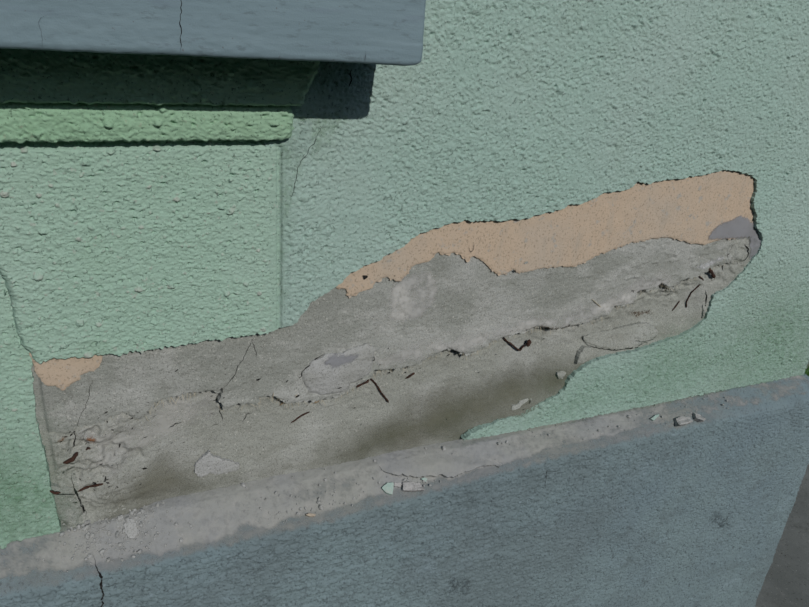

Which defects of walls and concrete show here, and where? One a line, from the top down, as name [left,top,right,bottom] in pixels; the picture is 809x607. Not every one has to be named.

spalling [29,170,754,528]
crack [56,475,86,519]
crack [95,561,104,607]